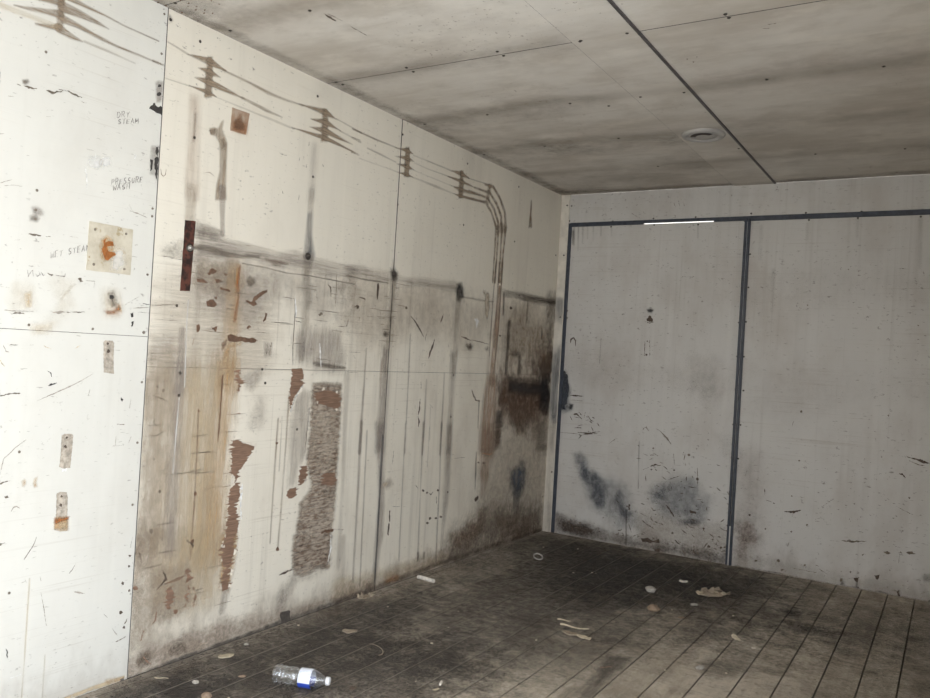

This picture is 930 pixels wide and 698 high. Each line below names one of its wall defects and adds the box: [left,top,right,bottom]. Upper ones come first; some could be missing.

rust [101,238,116,260]
water stain [450,171,556,444]
peeling [280,366,344,575]